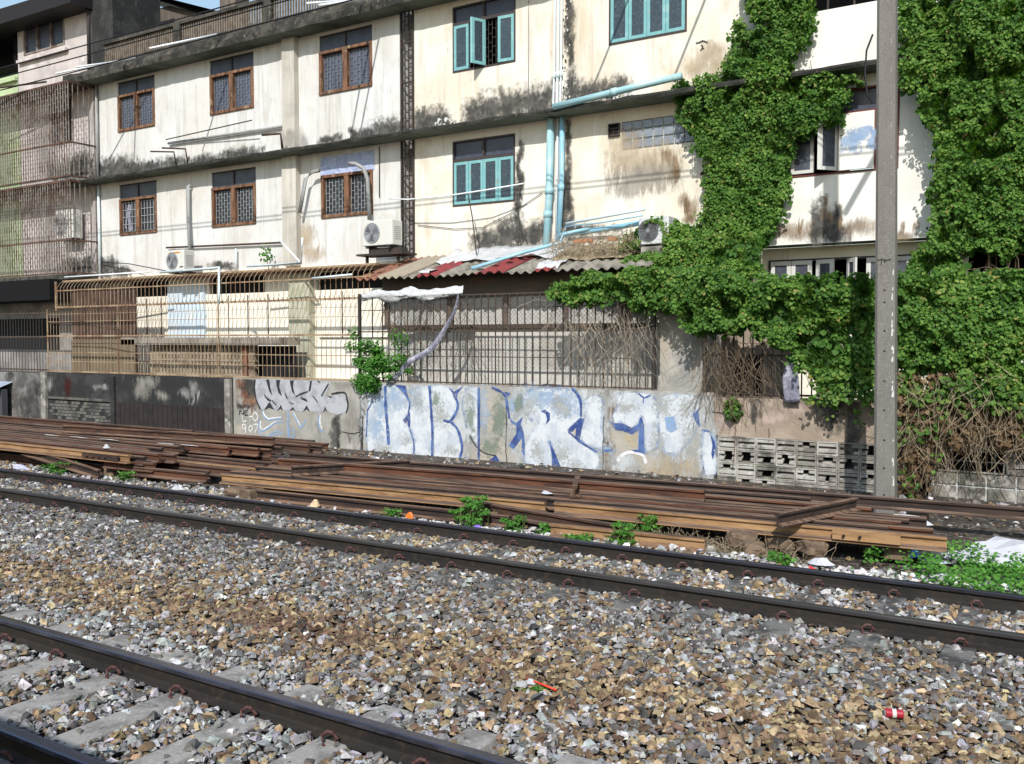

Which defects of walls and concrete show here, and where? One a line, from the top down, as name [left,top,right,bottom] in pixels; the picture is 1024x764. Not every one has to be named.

water stain [318,0,628,144]
mould [50,146,265,181]
water stain [471,140,551,249]
water stain [771,197,874,247]